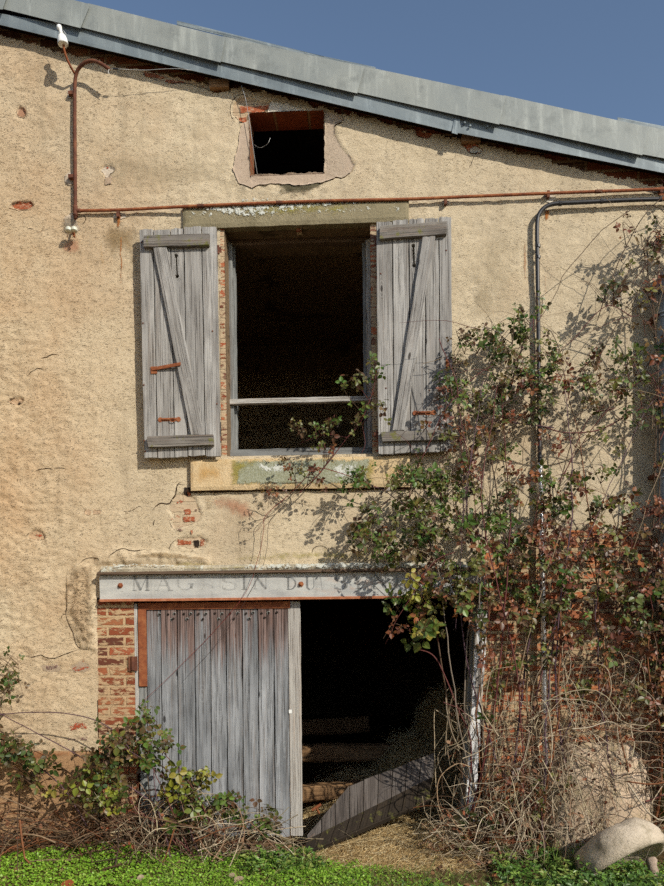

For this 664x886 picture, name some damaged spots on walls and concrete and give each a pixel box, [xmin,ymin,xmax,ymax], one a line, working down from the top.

peeling [190,97,371,217]
peeling [9,200,34,211]
crack [124,483,182,525]
flaking render [169,487,207,549]